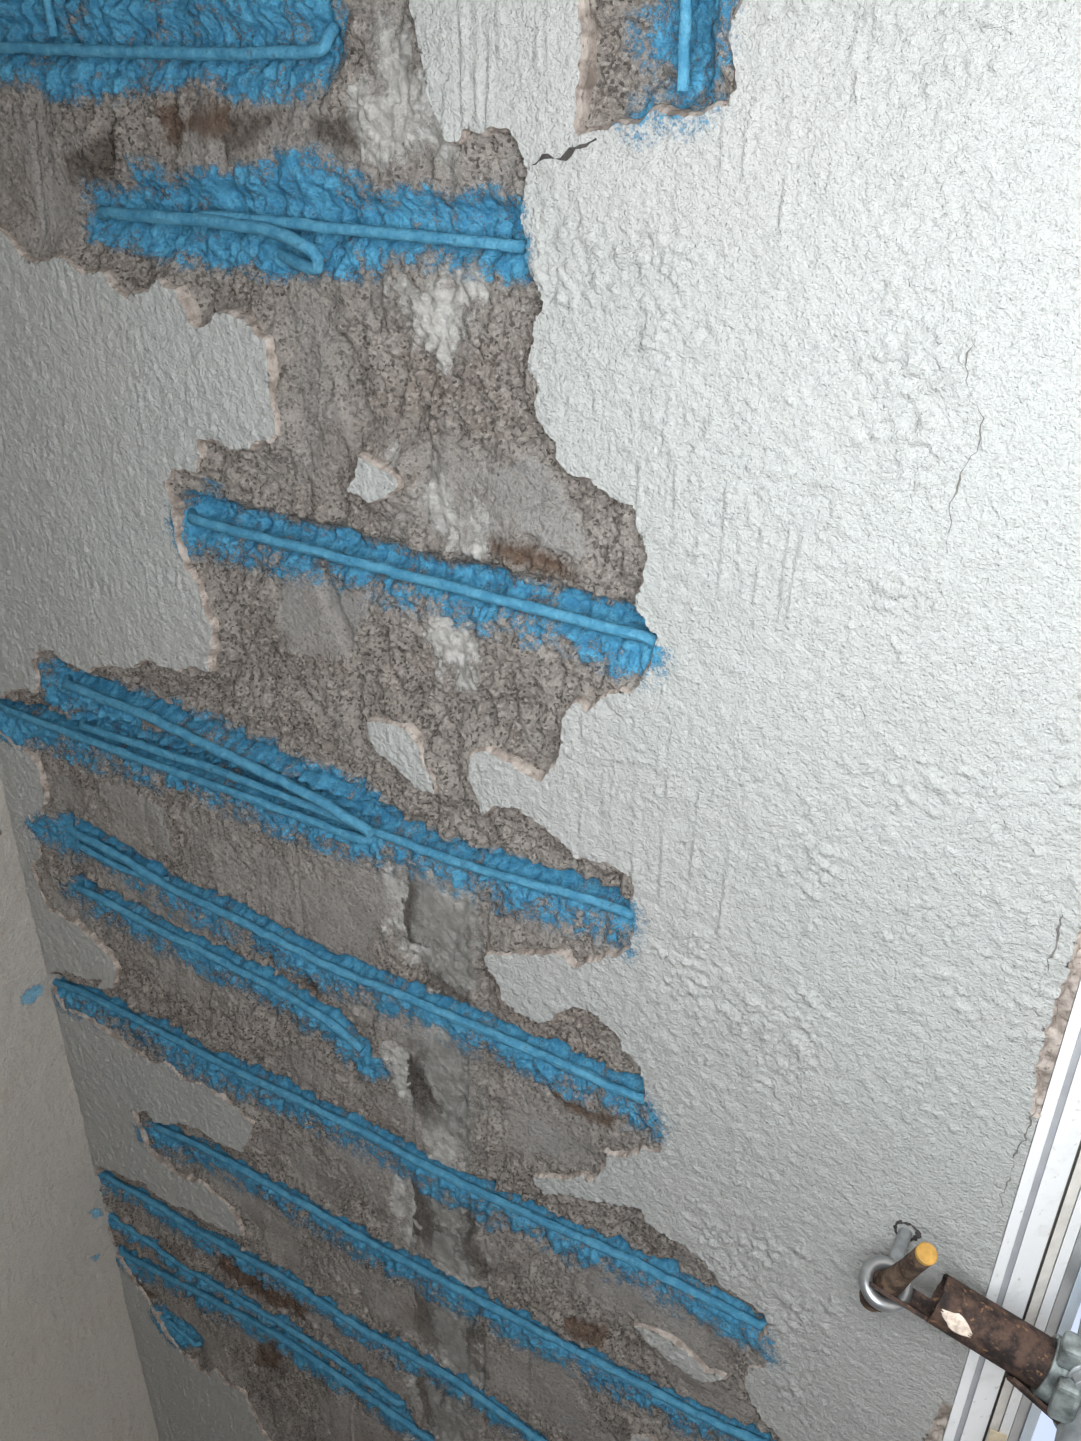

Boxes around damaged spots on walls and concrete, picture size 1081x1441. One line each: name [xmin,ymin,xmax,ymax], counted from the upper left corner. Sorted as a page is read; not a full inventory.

spalling [0,0,782,1441]
crack [532,138,597,165]